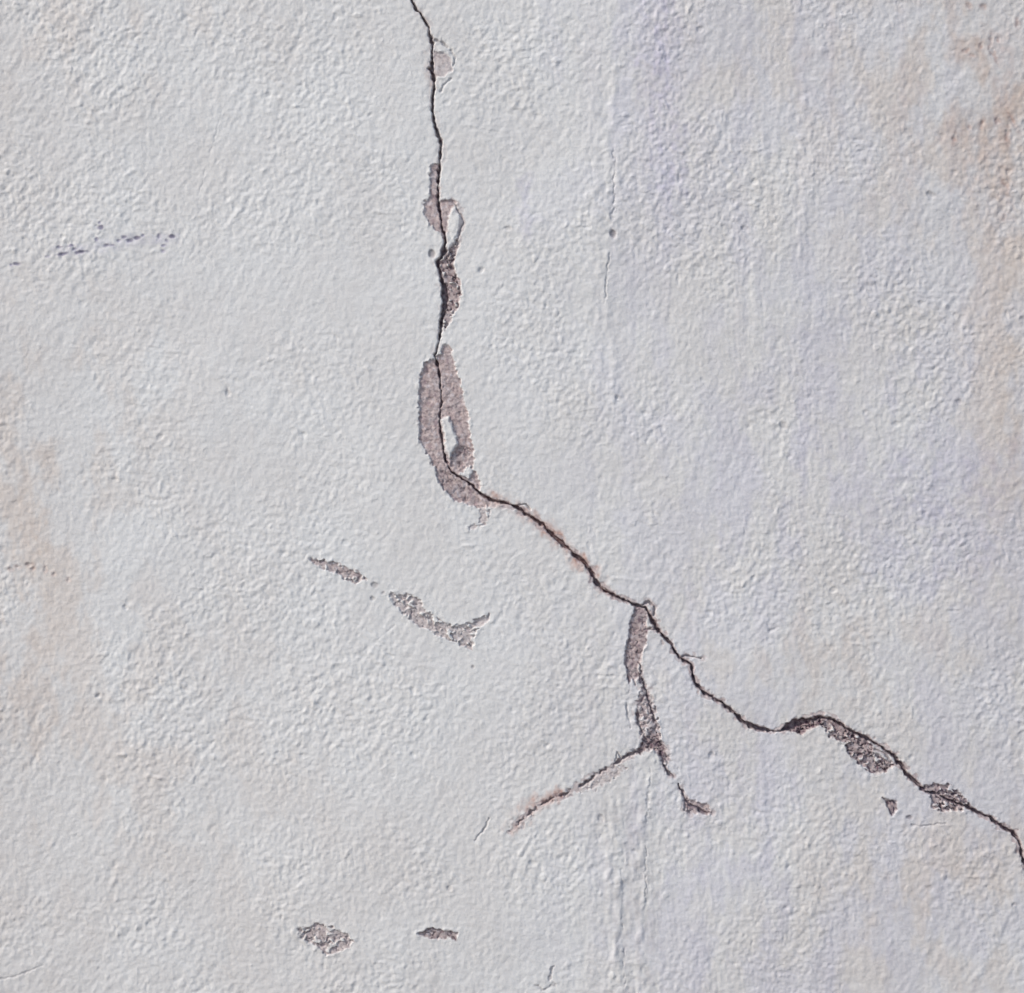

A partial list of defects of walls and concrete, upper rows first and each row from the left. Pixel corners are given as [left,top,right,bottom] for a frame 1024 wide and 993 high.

spalling [416,163,491,532]
crack [409,0,1024,882]
spalling [308,557,491,651]
spalling [789,721,894,777]
spalling [881,781,972,828]
peeling [296,922,356,957]
peeling [416,926,459,943]